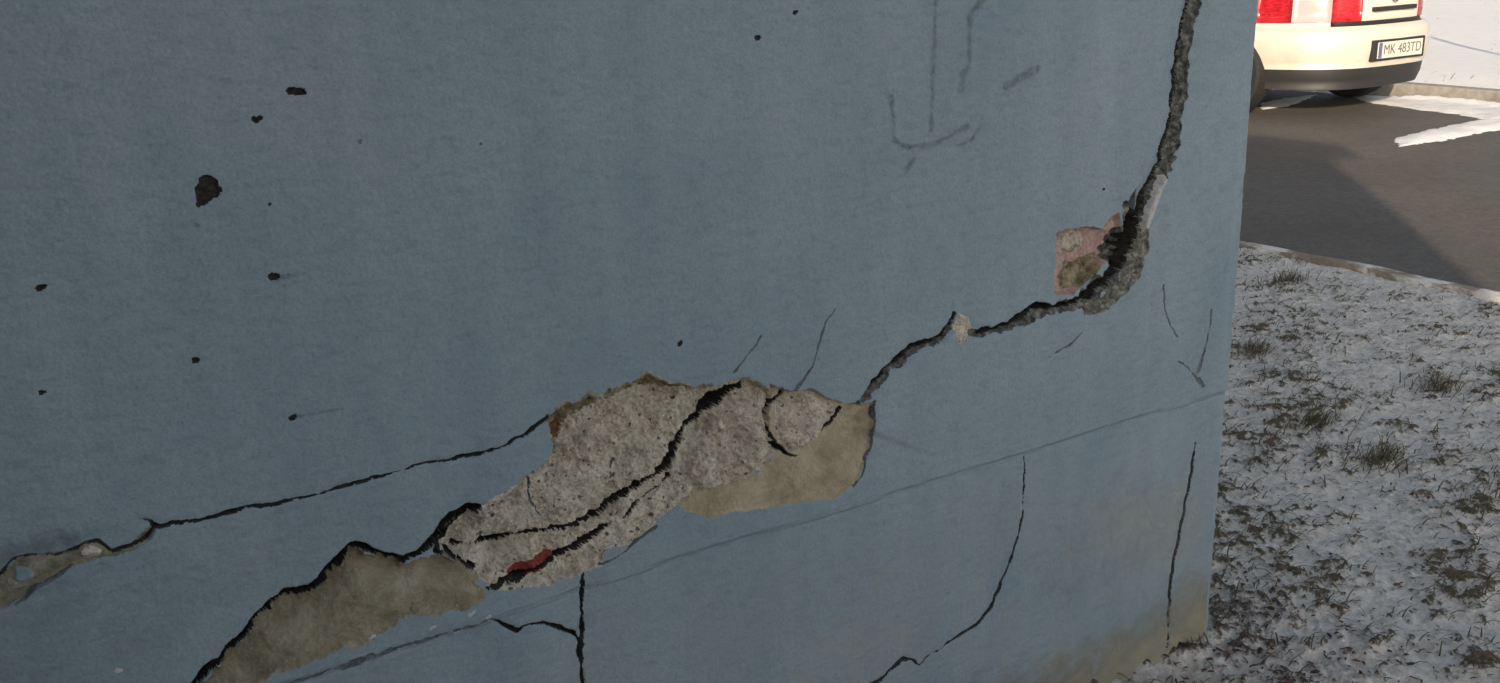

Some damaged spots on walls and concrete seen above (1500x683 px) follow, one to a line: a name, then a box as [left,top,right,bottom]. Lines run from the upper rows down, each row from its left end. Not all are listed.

crack [853,0,1212,405]
spalling [1054,212,1122,296]
crack [733,335,762,374]
crack [787,308,835,392]
peeling [0,522,158,610]
crack [140,414,548,529]
crack [191,502,585,683]
spalling [431,371,876,591]
crack [870,456,1026,683]
crack [1166,442,1196,648]